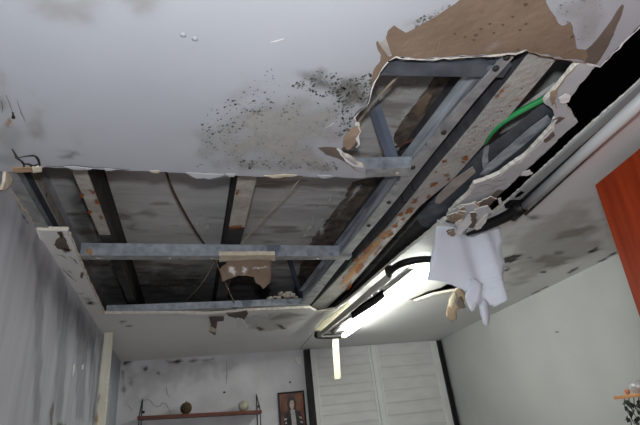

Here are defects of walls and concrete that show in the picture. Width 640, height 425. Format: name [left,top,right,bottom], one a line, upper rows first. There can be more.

mould [197,71,373,171]
peeling [310,0,640,246]
flaking render [54,231,104,313]
spalling [292,260,321,296]
corrosion [339,197,418,291]